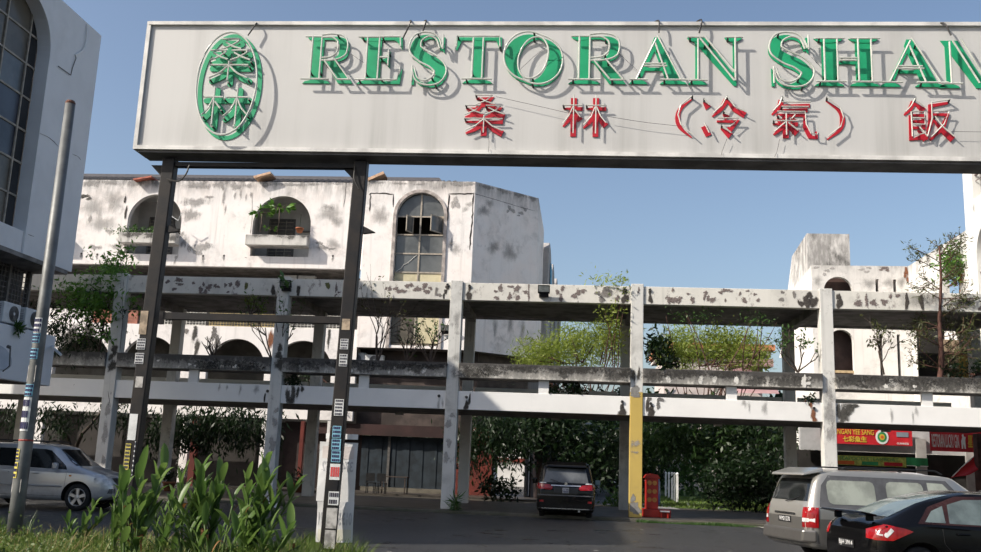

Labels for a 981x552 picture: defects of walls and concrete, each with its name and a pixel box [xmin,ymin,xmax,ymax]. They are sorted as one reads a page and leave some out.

leakage [81,180,117,233]
leakage [184,182,268,220]
leakage [442,182,535,208]
leakage [169,232,210,263]
peeling [385,283,443,297]
peeling [494,284,530,301]
peeling [556,286,620,302]
peeling [665,287,760,305]
peeling [854,291,900,308]
leakage [351,361,814,388]
leakage [646,397,665,416]
leakage [826,375,981,439]